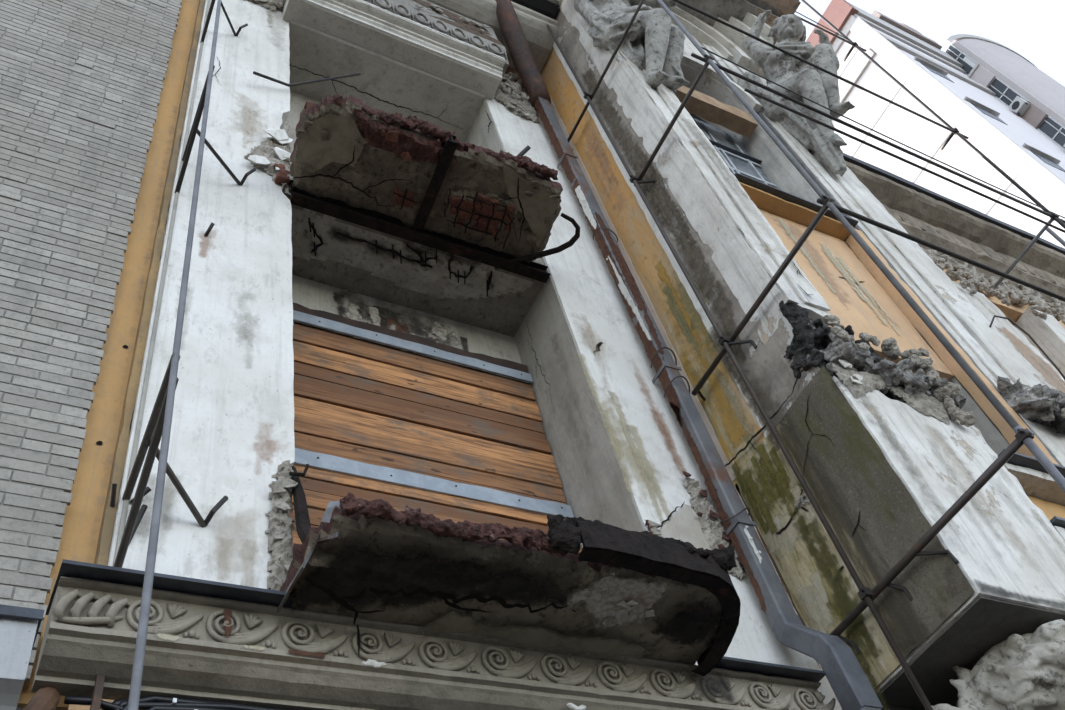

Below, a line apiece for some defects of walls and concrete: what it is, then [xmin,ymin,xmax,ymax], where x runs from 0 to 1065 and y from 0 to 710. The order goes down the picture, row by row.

crack [293,146,411,211]
spalling [244,113,533,299]
crack [504,178,525,241]
peeling [575,185,597,229]
leakage [583,69,899,710]
spalling [779,300,976,427]
spalling [997,328,1065,433]
crack [725,360,834,534]
flaking render [265,460,298,591]
flaking render [645,471,745,580]
crack [306,577,576,656]
peeling [569,574,668,628]